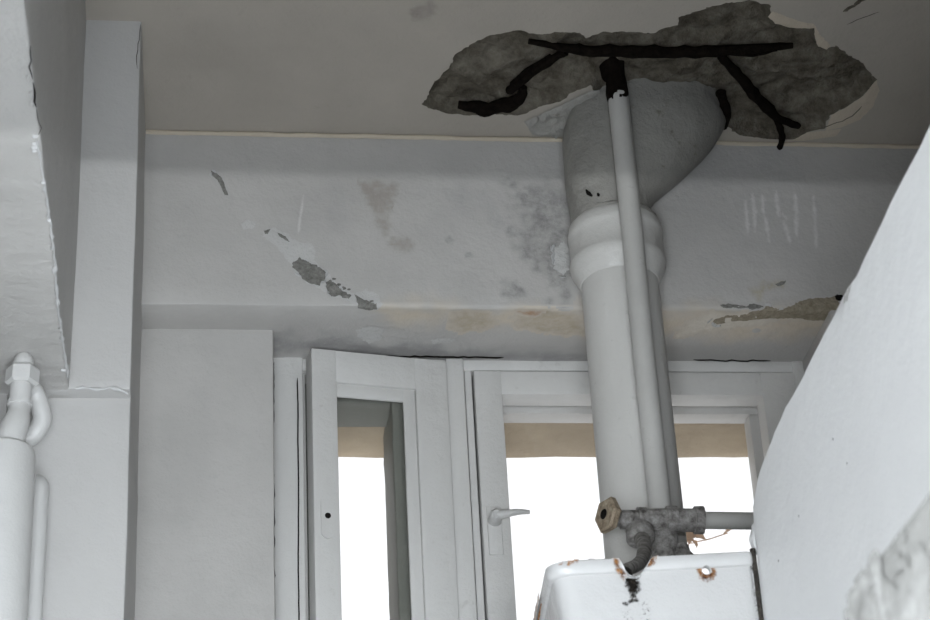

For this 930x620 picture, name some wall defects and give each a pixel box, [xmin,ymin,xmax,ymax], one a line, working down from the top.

crack [26,45,42,135]
spalling [422,0,880,150]
flaking render [262,227,383,310]
damp [272,172,588,361]
damp [661,292,824,349]
flaking render [672,293,843,339]